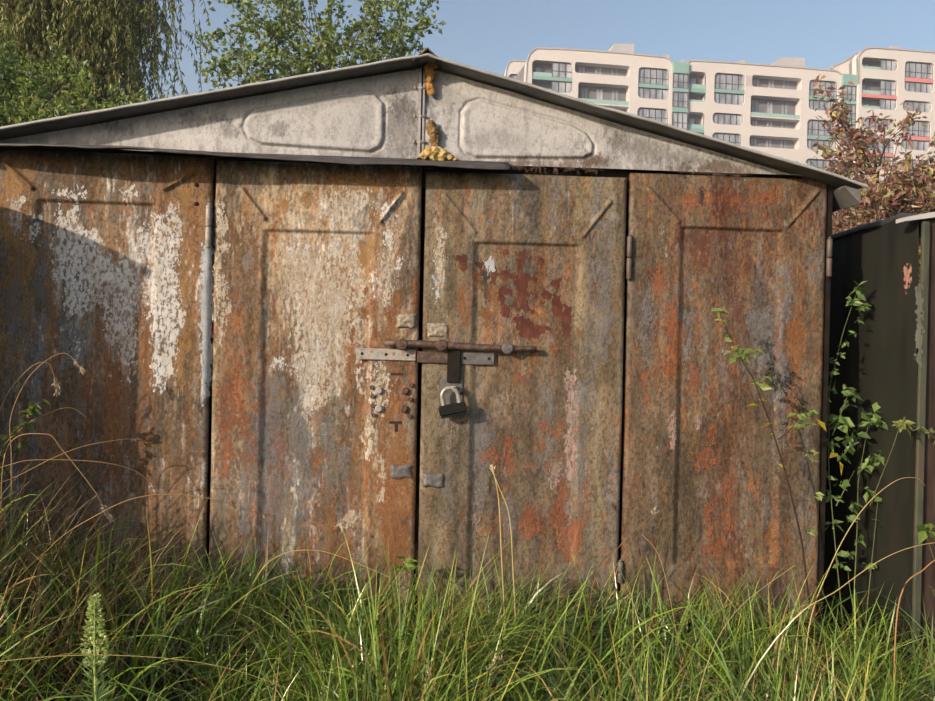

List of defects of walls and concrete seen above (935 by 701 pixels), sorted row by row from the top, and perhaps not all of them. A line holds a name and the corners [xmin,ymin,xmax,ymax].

corrosion [0,167,58,390]
peeling [3,184,187,394]
corrosion [91,183,198,401]
peeling [270,229,404,423]
corrosion [276,170,408,214]
corrosion [319,209,404,420]
corrosion [453,245,575,368]
corrosion [639,259,702,417]
corrosion [682,223,780,378]
corrosion [215,370,288,510]
corrosion [308,381,419,580]
corrosion [477,435,516,478]